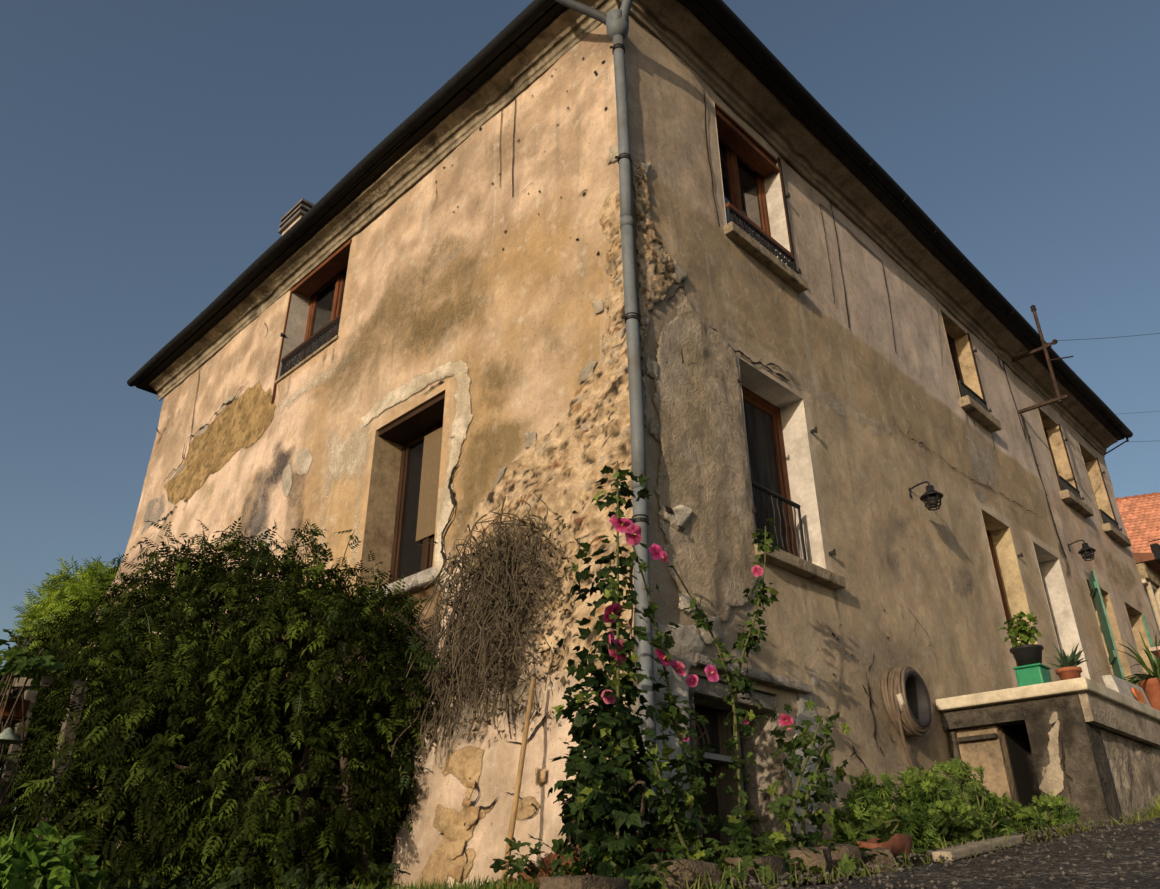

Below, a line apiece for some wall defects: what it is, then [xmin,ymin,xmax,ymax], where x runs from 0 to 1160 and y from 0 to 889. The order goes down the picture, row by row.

flaking render [607,144,618,163]
crack [708,325,802,391]
flaking render [162,381,276,504]
leakage [238,445,302,563]
flaking render [361,360,473,604]
flaking render [459,159,760,820]
flaking render [417,746,495,889]